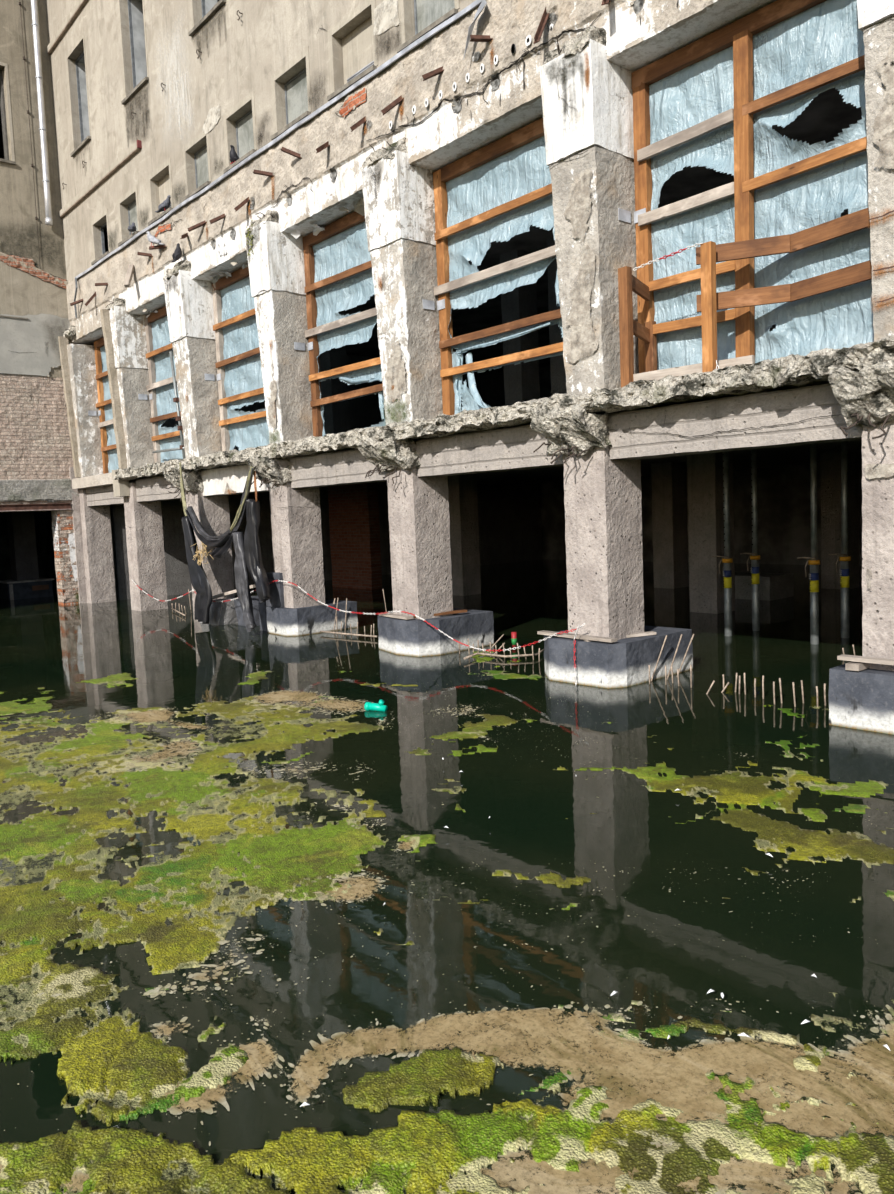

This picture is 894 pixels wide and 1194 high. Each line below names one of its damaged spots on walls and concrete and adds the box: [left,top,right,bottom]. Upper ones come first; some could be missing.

spalling [113,335,894,502]